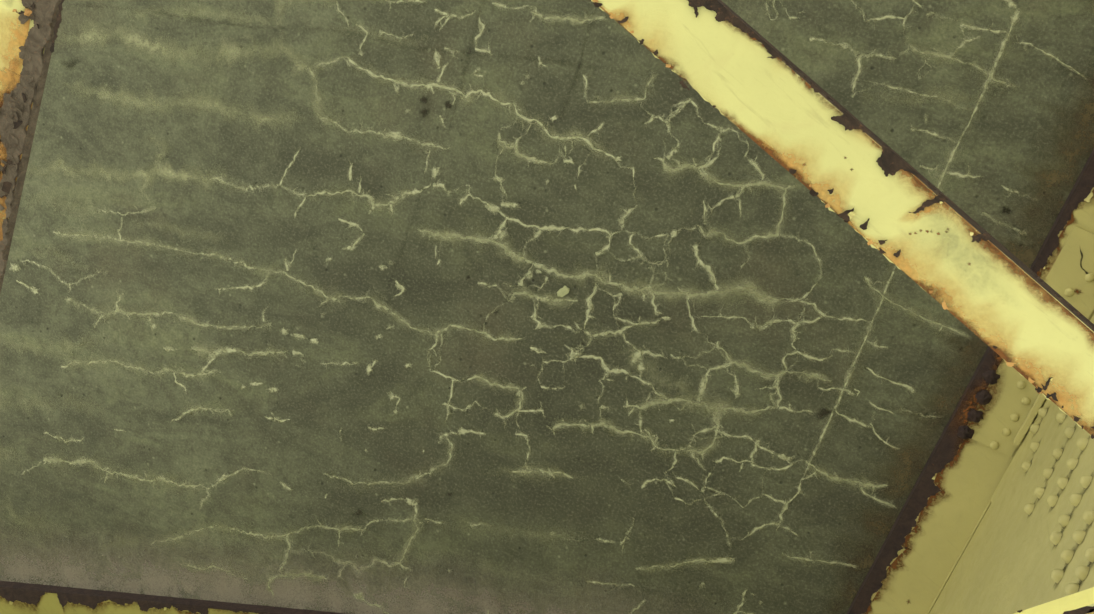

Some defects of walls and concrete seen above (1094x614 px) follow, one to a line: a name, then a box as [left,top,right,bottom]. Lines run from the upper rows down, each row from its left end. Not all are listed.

damp [80,27,193,57]
corrosion [600,6,686,80]
crack [846,0,1082,196]
corrosion [0,0,62,294]
damp [100,155,211,185]
peeling [969,232,991,243]
crack [10,260,375,421]
crack [151,0,965,614]
corrosion [724,113,1094,614]
peeling [1028,377,1053,398]
crack [43,432,260,488]
damp [0,549,587,614]